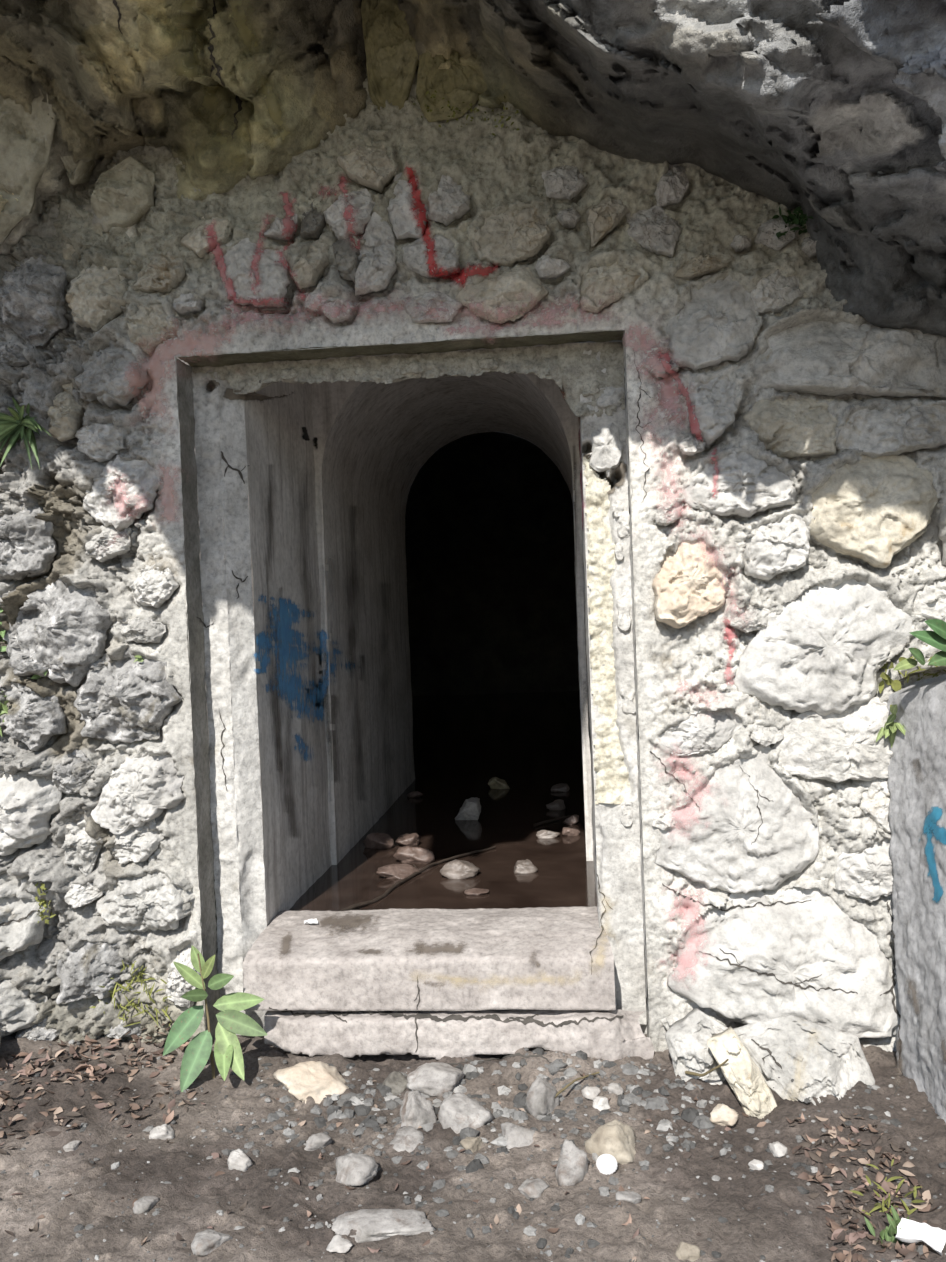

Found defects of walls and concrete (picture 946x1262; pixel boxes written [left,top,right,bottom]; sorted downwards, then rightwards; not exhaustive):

crack [113,0,122,34]
crack [207,0,243,140]
crack [221,451,249,484]
crack [662,883,811,911]
crack [269,976,623,1076]
crack [695,902,903,1096]